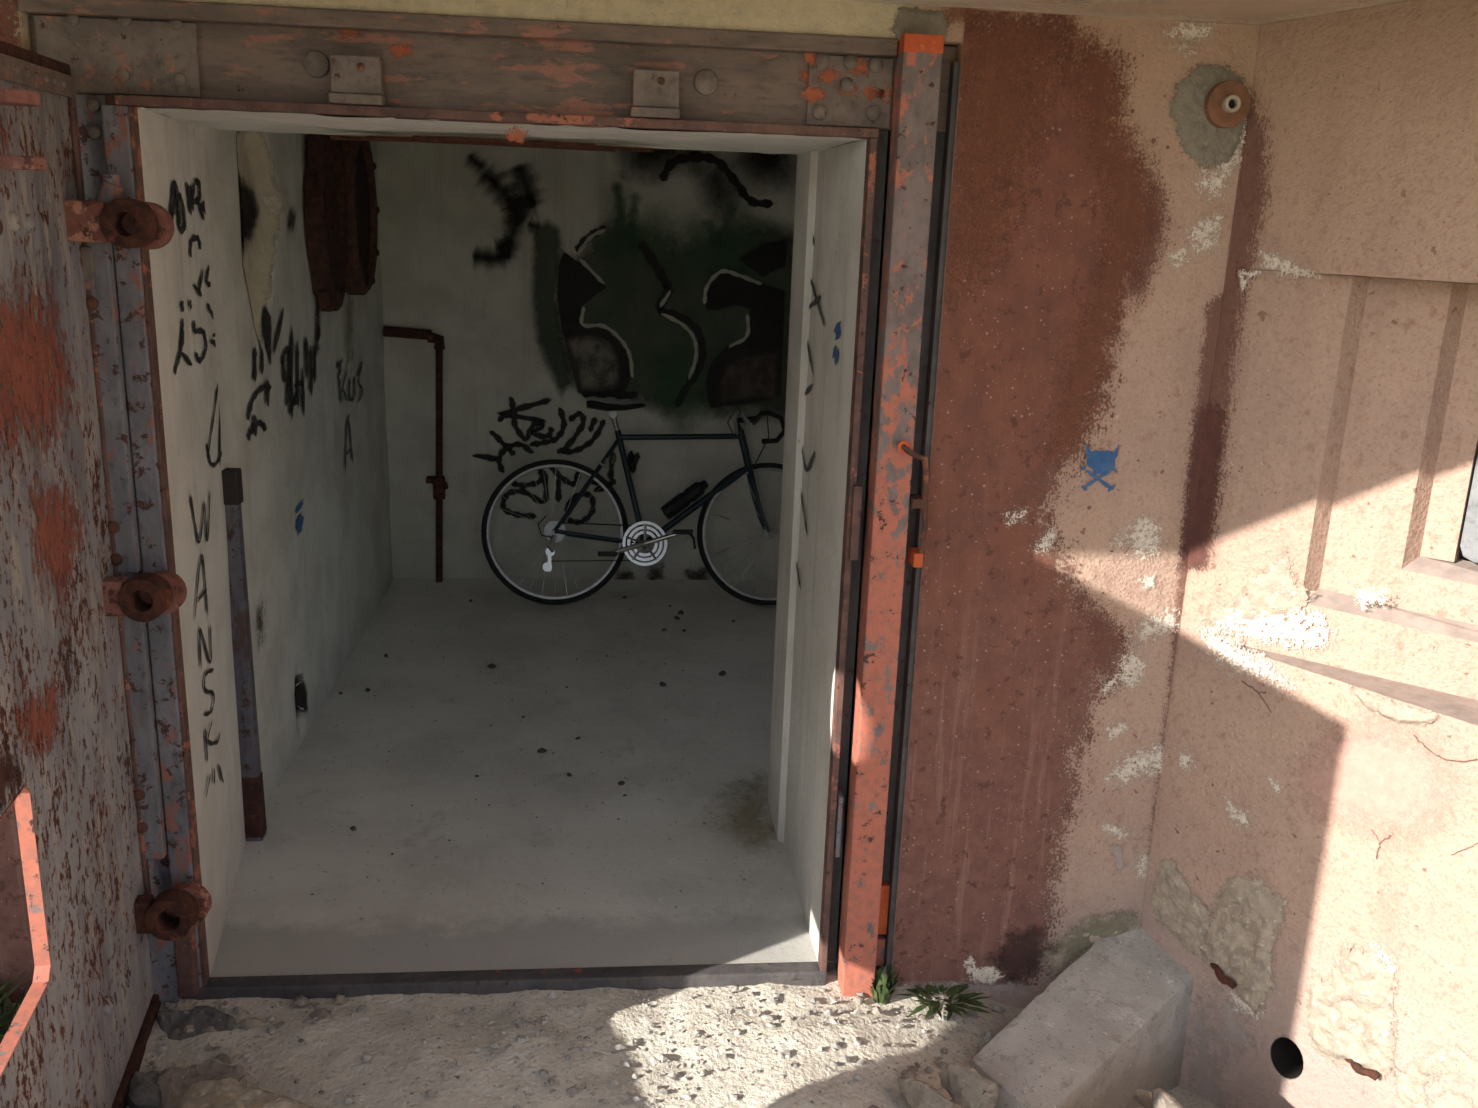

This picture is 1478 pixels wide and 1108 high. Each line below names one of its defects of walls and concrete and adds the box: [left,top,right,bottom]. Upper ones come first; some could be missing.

peeling [1123,118,1247,307]
peeling [1237,249,1322,295]
water stain [1160,87,1274,745]
rust [25,465,89,613]
rust [0,679,65,813]
peeling [1229,988,1265,1024]